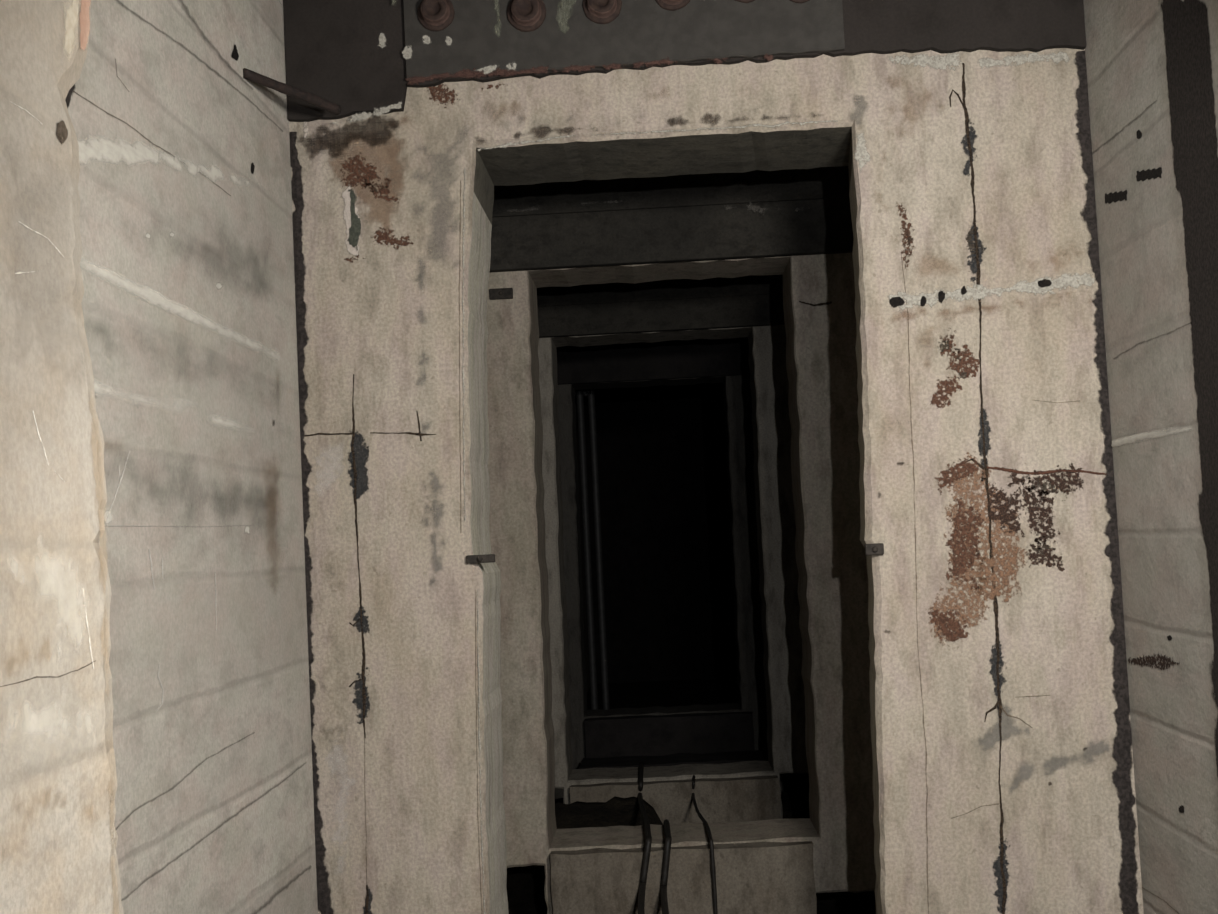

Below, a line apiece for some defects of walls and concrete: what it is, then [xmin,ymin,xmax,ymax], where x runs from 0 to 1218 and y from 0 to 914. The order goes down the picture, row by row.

corrosion [340,153,399,203]
corrosion [372,227,413,249]
corrosion [930,328,980,409]
crack [901,63,1107,914]
corrosion [928,452,1084,648]
crack [304,374,436,824]
crack [363,857,373,914]